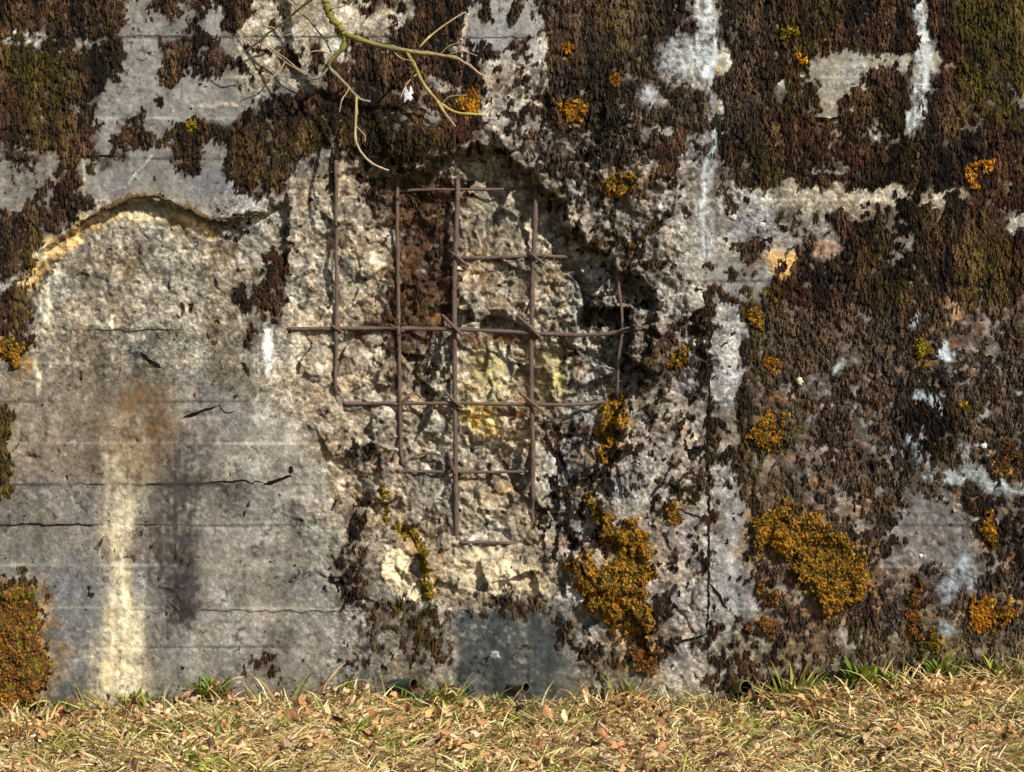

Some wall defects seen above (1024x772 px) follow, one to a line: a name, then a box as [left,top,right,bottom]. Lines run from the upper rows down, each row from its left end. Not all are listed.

damp [663,0,717,89]
damp [699,128,716,258]
crack [0,521,183,529]
damp [90,389,214,708]
crack [84,466,293,486]
spalling [18,145,661,618]
rust [391,177,454,389]
rust [466,334,525,344]
rust [477,408,523,417]
crack [650,353,728,661]